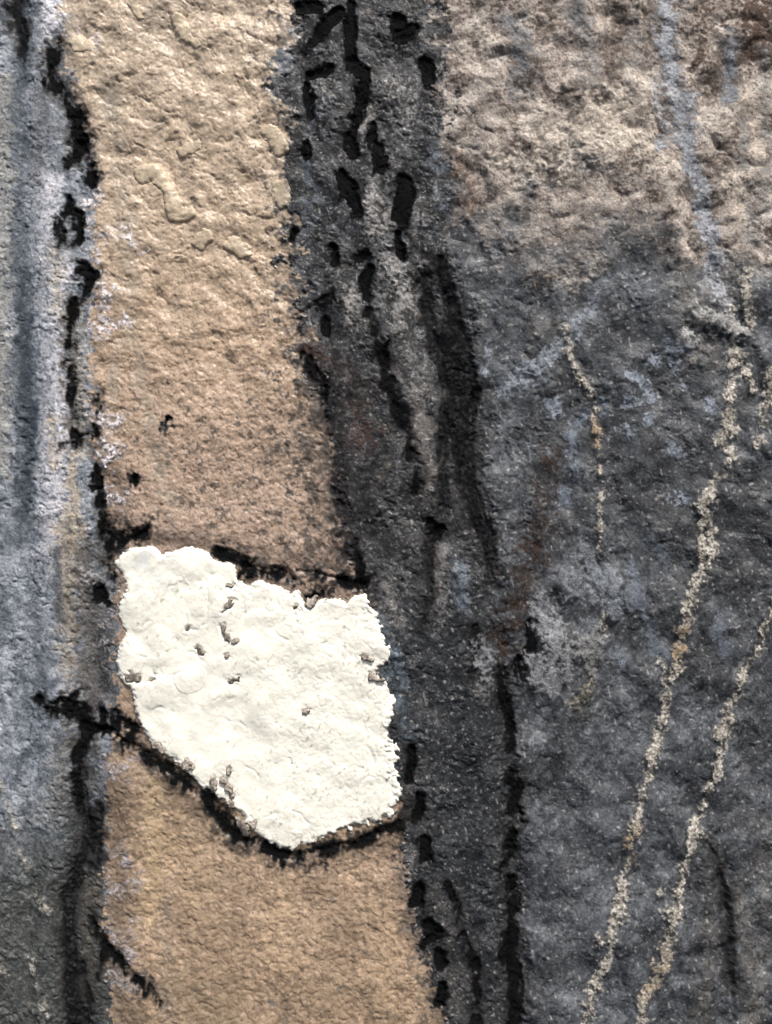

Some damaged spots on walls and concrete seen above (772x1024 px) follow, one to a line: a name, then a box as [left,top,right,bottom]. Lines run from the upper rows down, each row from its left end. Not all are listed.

crack [5,0,90,168]
crack [52,216,67,244]
crack [305,286,335,310]
crack [58,296,104,448]
crack [299,350,330,400]
crack [361,252,499,575]
crack [92,487,150,579]
crack [212,537,371,601]
crack [420,534,437,626]
crack [443,622,529,1024]